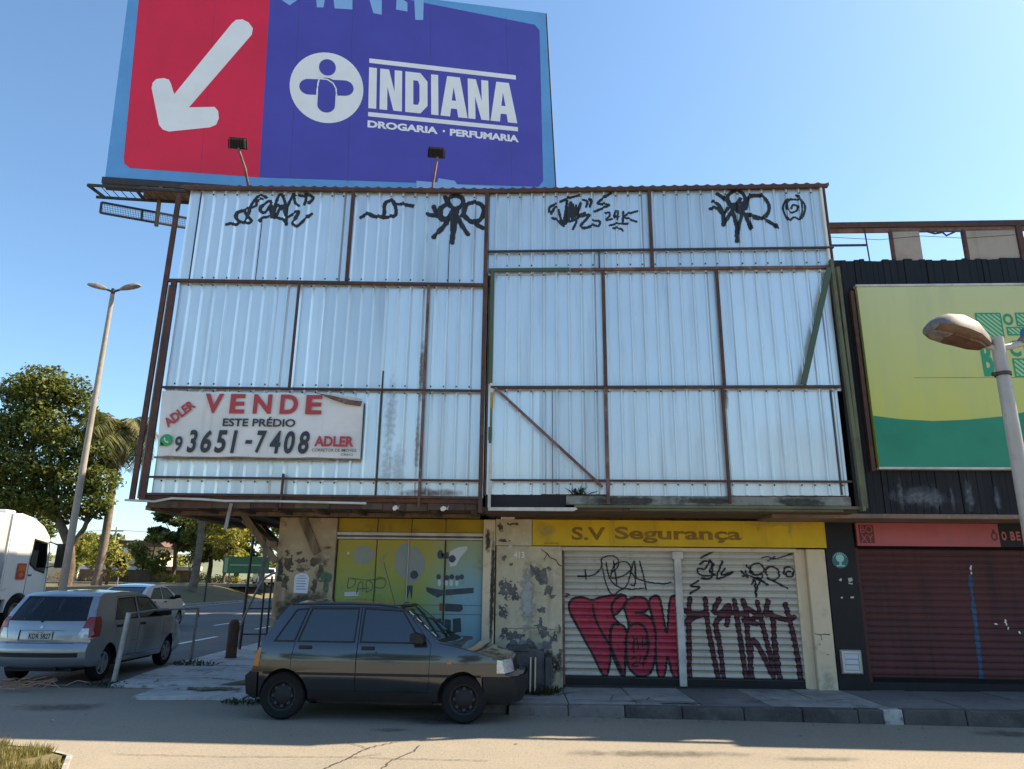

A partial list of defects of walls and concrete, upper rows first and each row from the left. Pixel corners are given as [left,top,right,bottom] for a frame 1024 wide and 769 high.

peeling [281,550,324,593]
peeling [495,522,563,673]